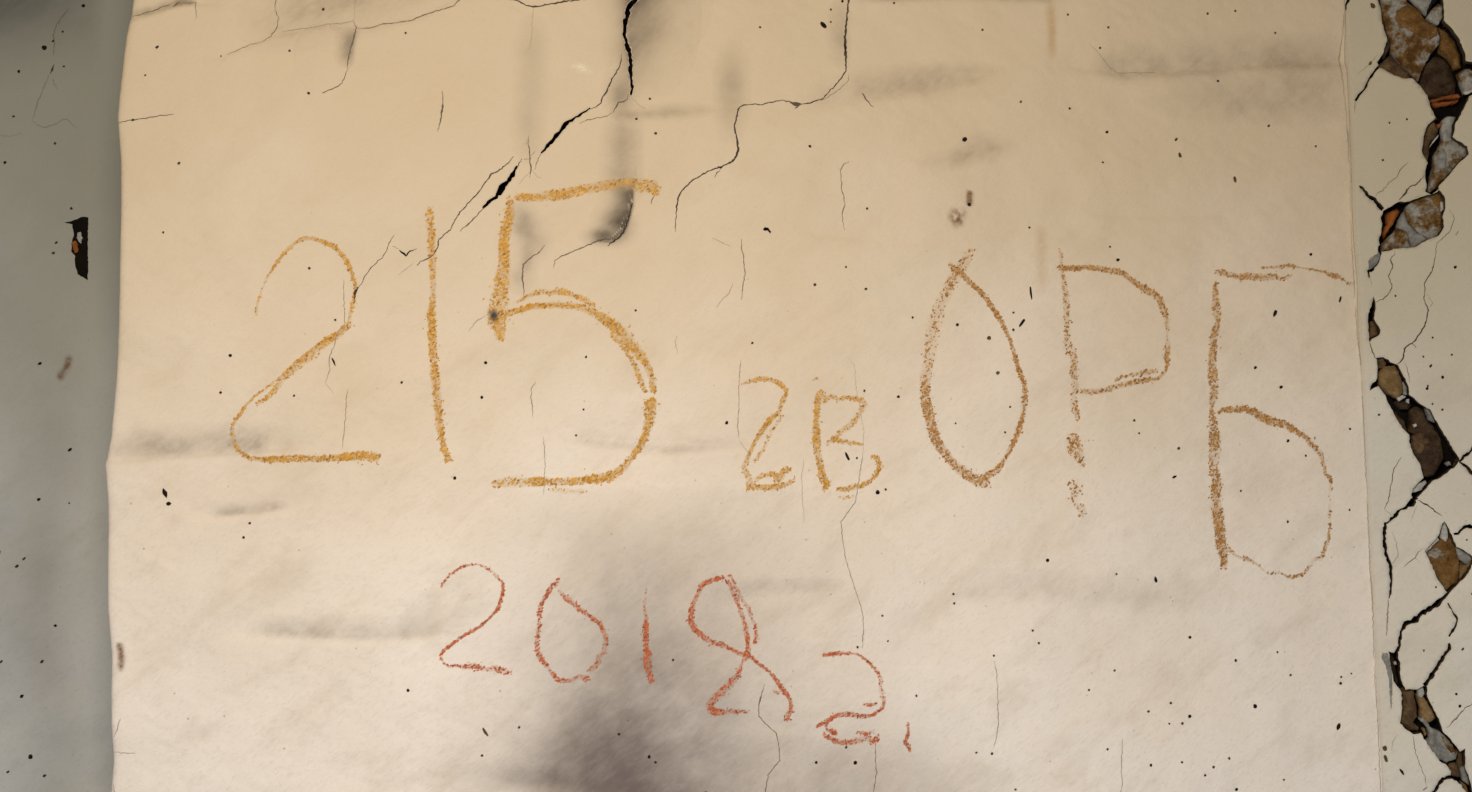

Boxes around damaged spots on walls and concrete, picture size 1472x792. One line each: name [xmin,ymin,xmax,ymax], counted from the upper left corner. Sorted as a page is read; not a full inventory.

crack [227,0,459,93]
crack [521,0,873,290]
flaking render [1369,0,1472,270]
crack [326,0,644,448]
crack [713,238,745,304]
flaking render [1368,301,1378,340]
crack [1338,0,1472,791]
flaking render [1370,356,1454,497]
flaking render [1425,522,1472,595]
crack [758,687,780,792]
flaking render [1381,637,1471,792]